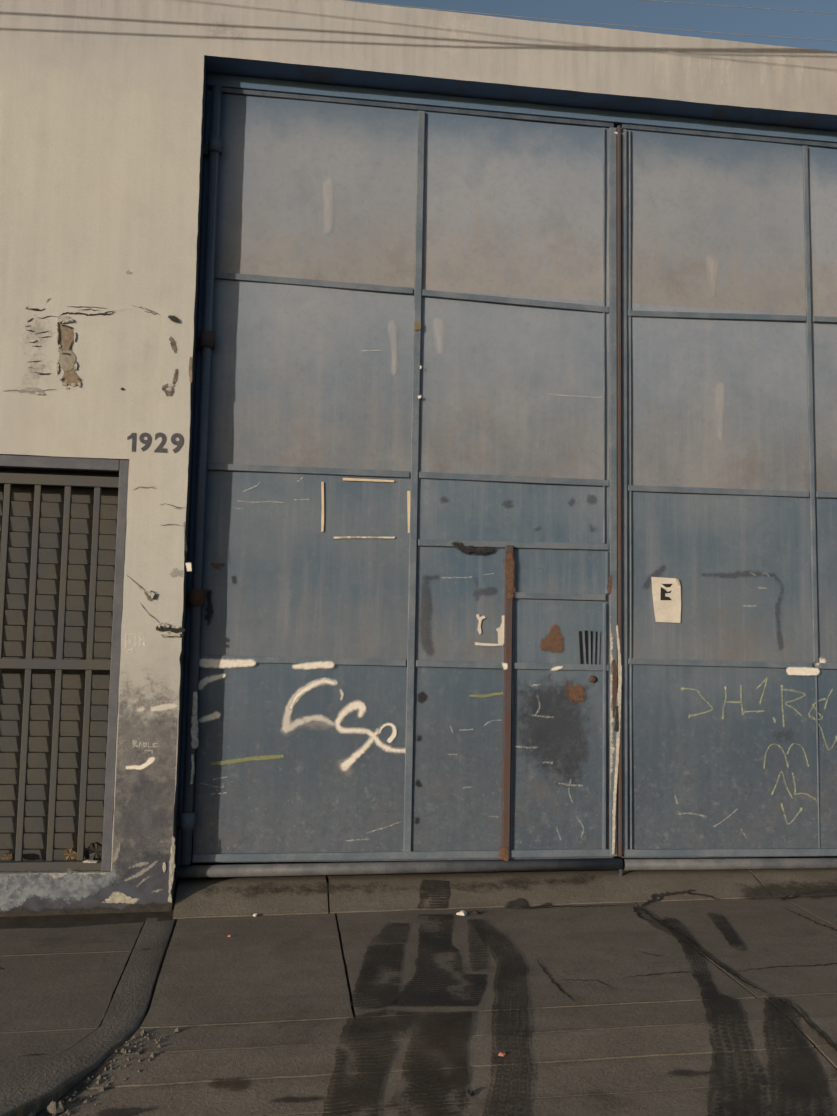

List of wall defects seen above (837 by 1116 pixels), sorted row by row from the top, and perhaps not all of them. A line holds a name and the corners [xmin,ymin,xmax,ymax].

spalling [56,315,81,389]
peeling [162,357,192,397]
rust [503,552,515,600]
rust [540,625,564,653]
water stain [519,683,585,781]